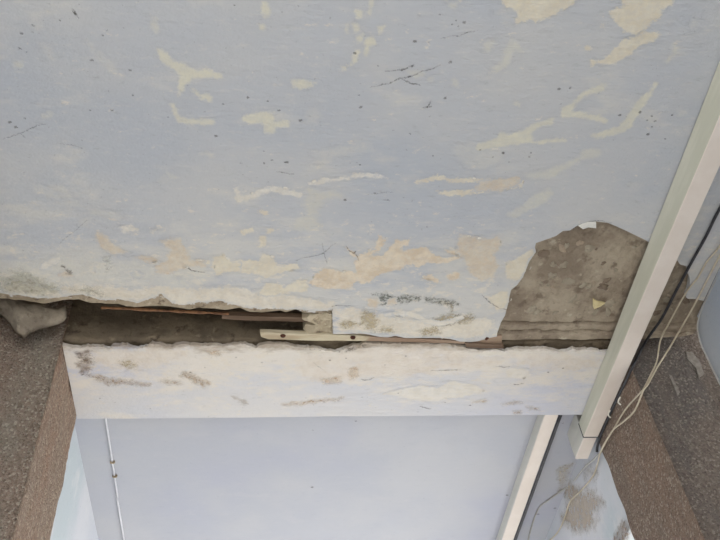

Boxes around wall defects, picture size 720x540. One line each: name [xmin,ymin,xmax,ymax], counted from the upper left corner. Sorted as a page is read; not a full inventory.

peeling [583,0,676,68]
peeling [154,46,226,127]
rust [101,306,229,315]
spalling [0,221,649,383]
spalling [642,261,712,339]